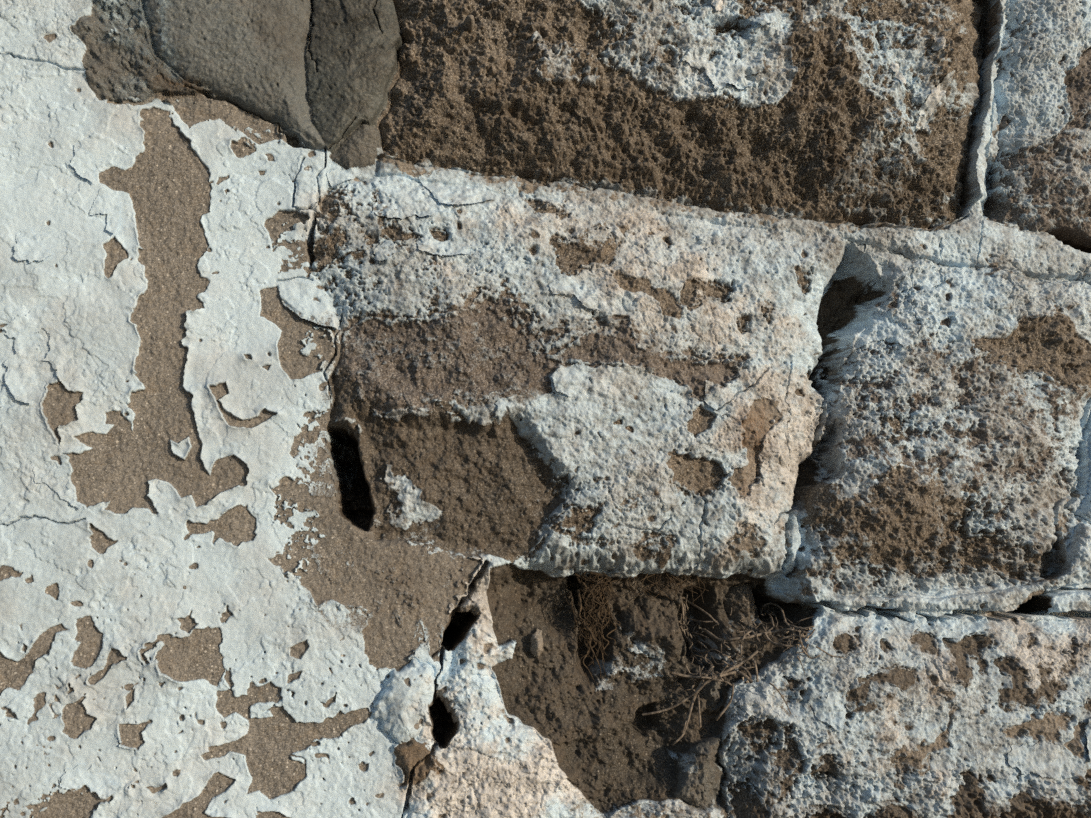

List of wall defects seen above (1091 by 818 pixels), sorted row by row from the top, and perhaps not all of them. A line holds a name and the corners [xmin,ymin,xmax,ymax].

crack [0,53,84,71]
crack [308,0,318,72]
peeling [581,0,981,132]
peeling [0,107,249,515]
crack [323,315,343,395]
spalling [260,153,746,671]
spalling [792,462,1071,583]
peeling [0,616,127,740]
peeling [140,605,372,818]
crack [401,740,440,818]
crack [431,558,495,704]
peeling [737,630,1091,818]